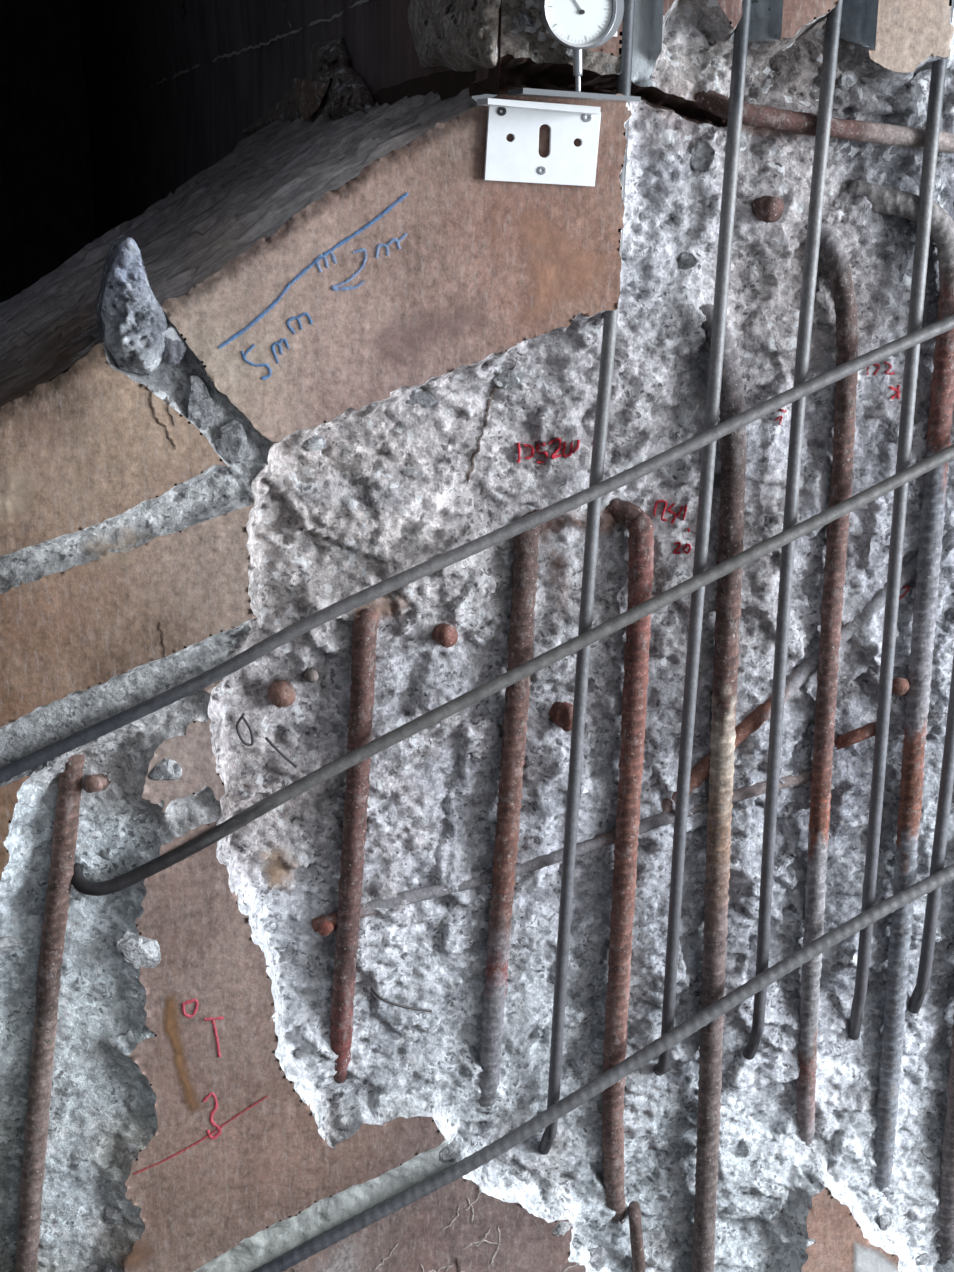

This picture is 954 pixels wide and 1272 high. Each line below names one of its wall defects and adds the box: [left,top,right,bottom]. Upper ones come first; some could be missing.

crack [372,54,728,127]
peeling [162,324,186,365]
peeling [186,375,247,465]
corrosion [539,512,618,539]
corrosion [358,598,408,616]
corrosion [553,553,569,612]
spalling [216,0,954,1164]
spalling [0,448,702,1272]
spalling [462,880,954,1272]
crack [421,1177,500,1272]